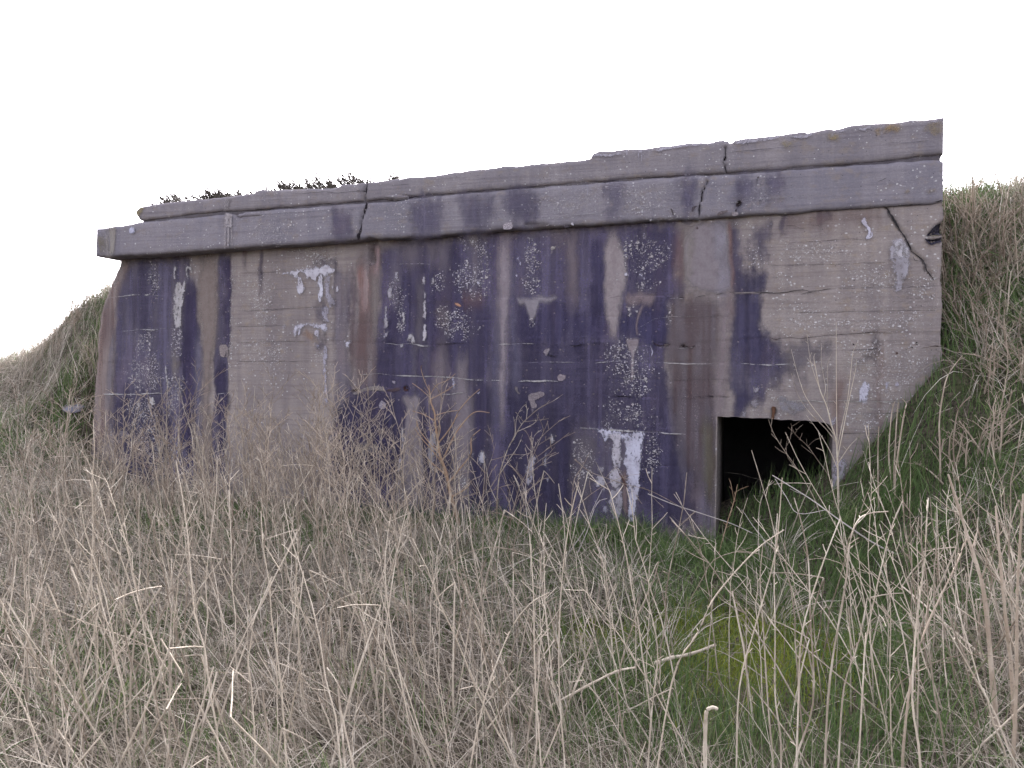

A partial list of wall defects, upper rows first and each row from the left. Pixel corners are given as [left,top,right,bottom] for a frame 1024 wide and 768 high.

leakage [109,197,233,483]
crack [295,184,368,240]
leakage [283,182,816,532]
crack [699,145,801,214]
crack [665,200,942,350]